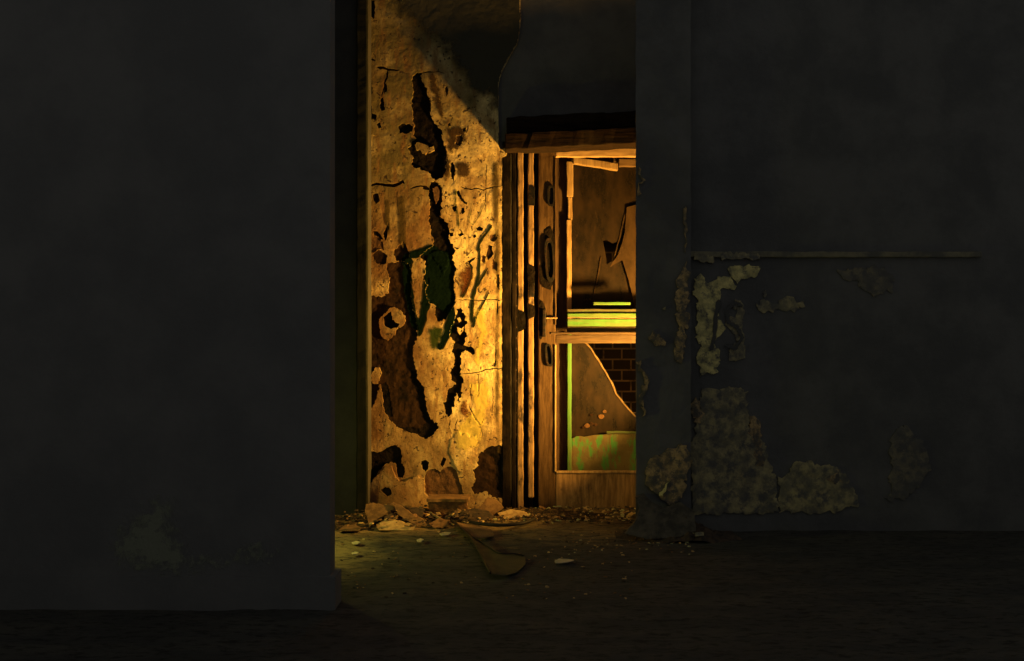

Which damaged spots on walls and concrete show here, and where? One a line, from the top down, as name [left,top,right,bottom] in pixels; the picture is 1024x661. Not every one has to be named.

flaking render [372,445,405,480]
flaking render [371,73,500,439]
flaking render [421,445,502,498]
peeling [644,207,859,515]